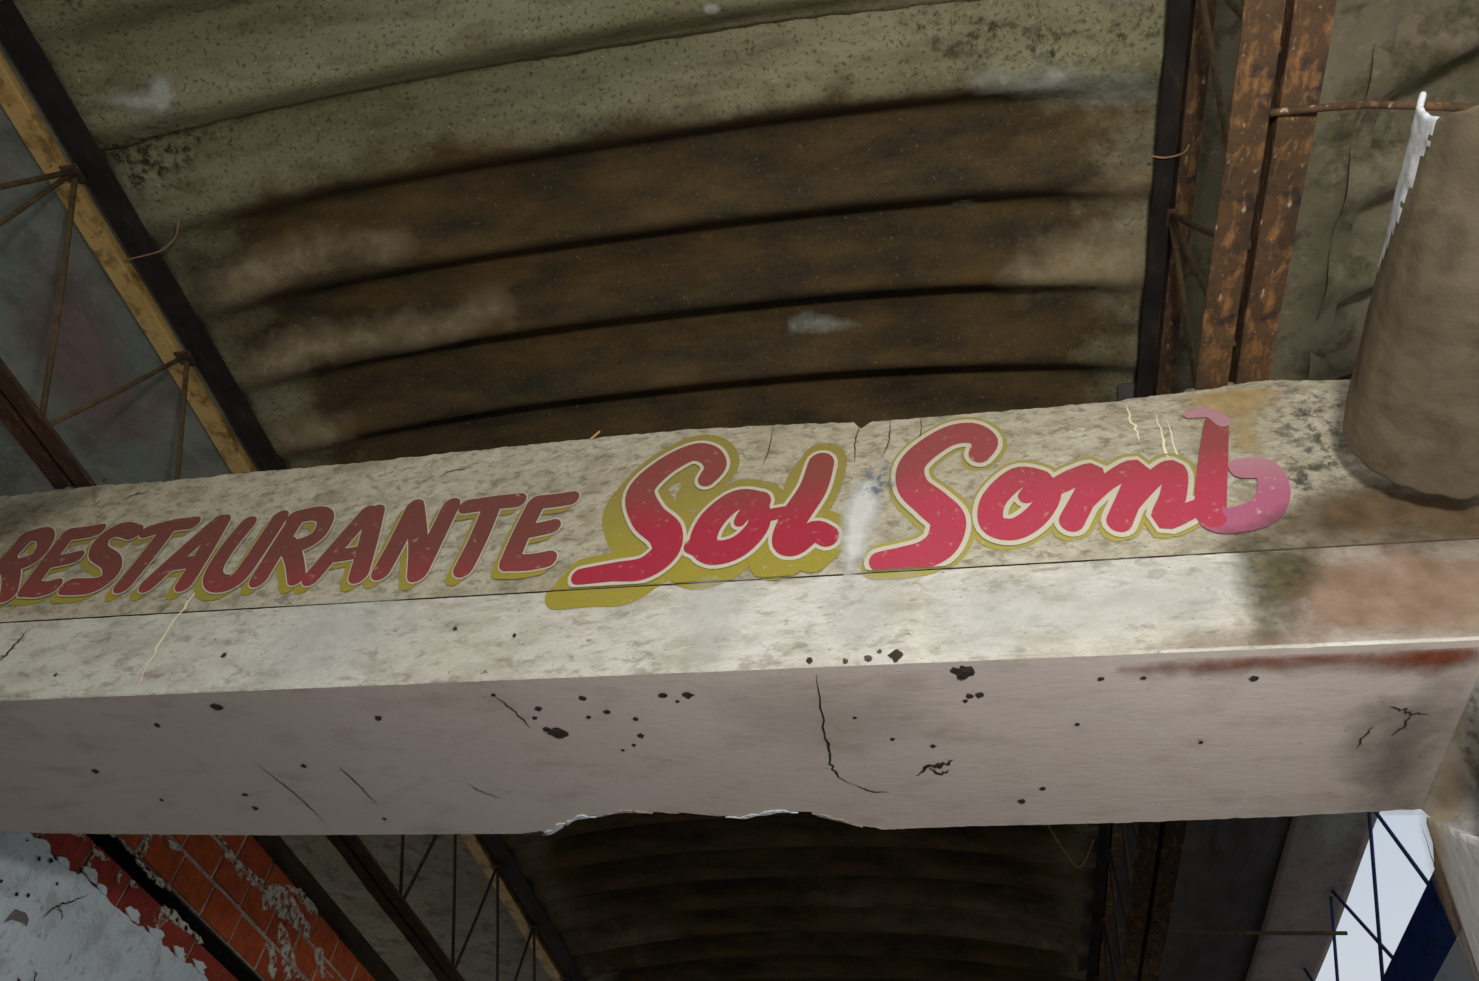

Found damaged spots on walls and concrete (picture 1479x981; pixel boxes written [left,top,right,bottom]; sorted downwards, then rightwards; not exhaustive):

leakage [226,241,333,302]
leakage [1019,240,1145,297]
leakage [259,304,499,376]
leakage [279,420,338,451]
crack [816,675,882,792]
spalling [0,879,30,926]
peeling [26,833,207,974]